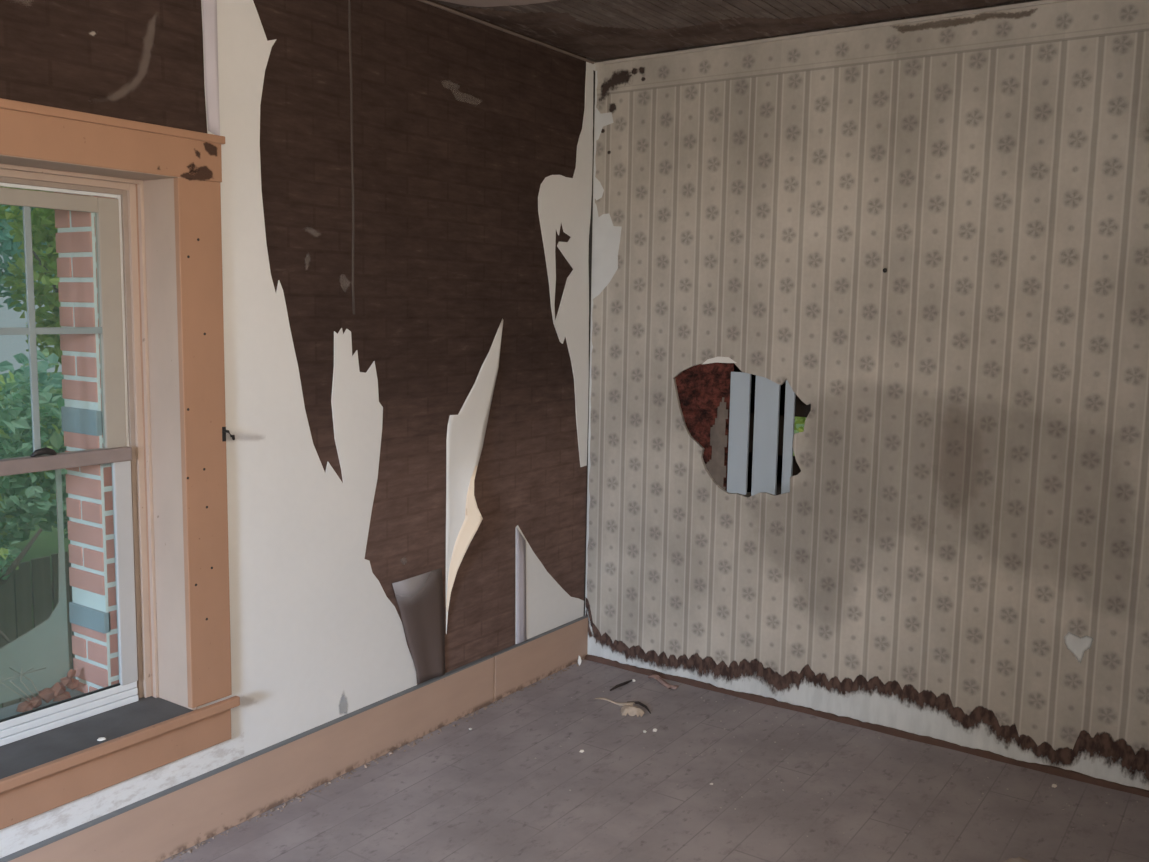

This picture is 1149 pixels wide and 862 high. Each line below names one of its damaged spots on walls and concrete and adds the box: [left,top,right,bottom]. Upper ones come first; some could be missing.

flaking render [0,0,220,181]
flaking render [253,0,1025,673]
peeling [1065,633,1092,661]